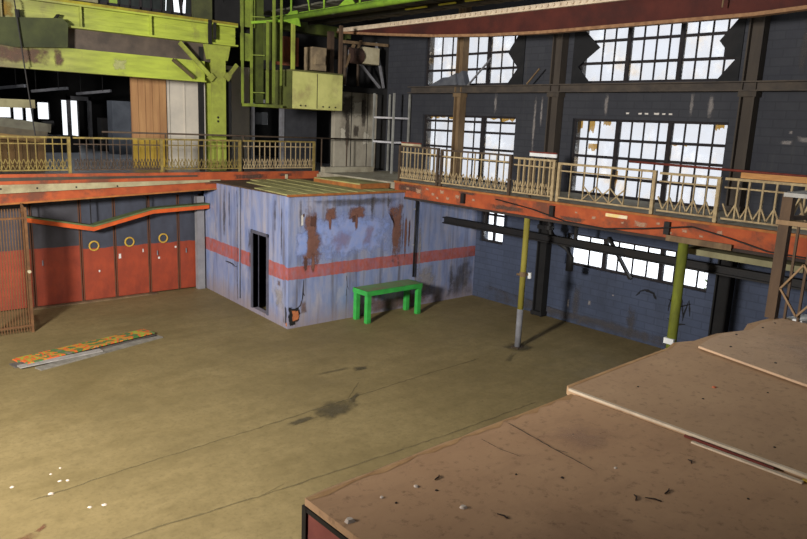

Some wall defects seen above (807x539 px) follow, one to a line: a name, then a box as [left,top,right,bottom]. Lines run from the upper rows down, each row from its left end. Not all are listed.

rust [303,208,336,272]
rust [349,206,364,228]
rust [389,205,410,256]
damp [291,394,358,425]